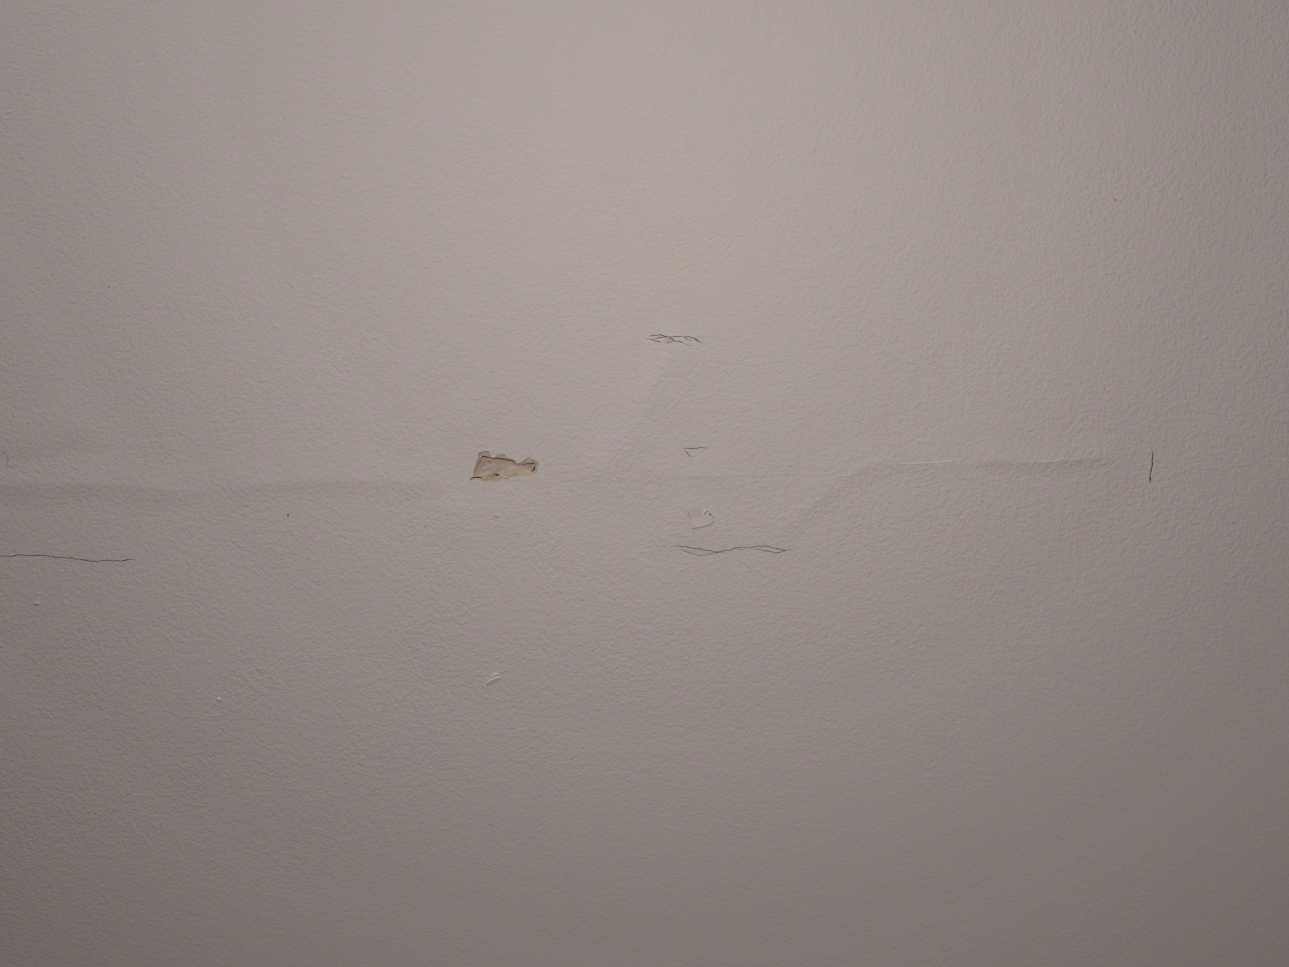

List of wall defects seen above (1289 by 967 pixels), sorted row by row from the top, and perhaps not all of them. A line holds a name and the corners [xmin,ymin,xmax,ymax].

crack [675,546,790,556]
crack [0,554,135,562]